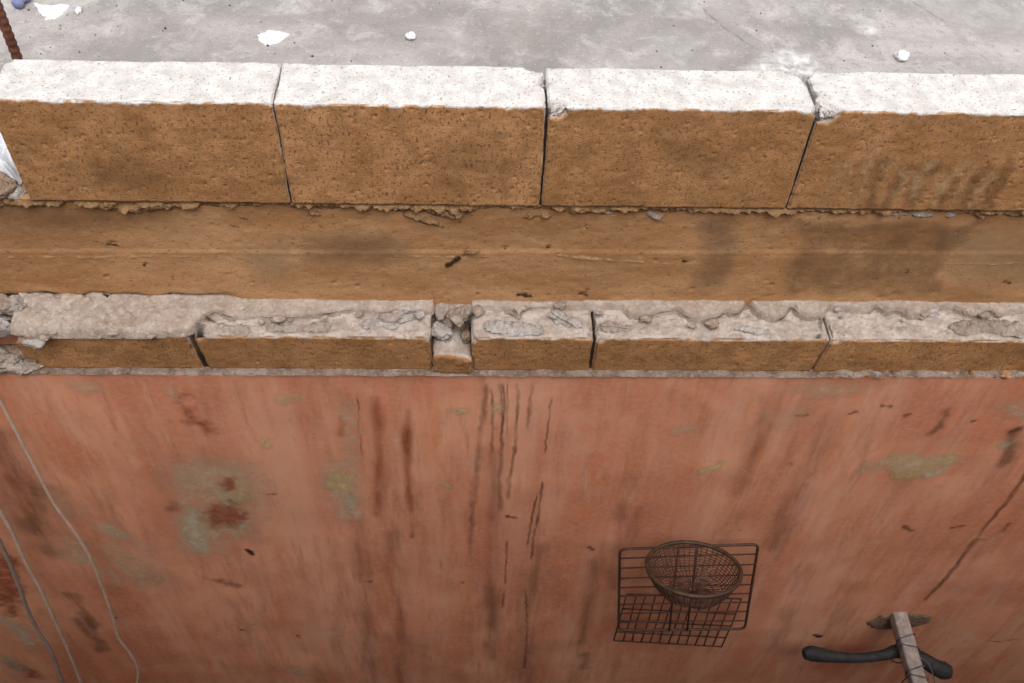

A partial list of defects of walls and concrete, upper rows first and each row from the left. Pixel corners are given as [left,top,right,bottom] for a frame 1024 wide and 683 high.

crack [272,104,292,202]
crack [539,80,549,204]
crack [786,79,819,207]
crack [196,312,235,367]
crack [514,307,626,368]
crack [989,476,1024,522]